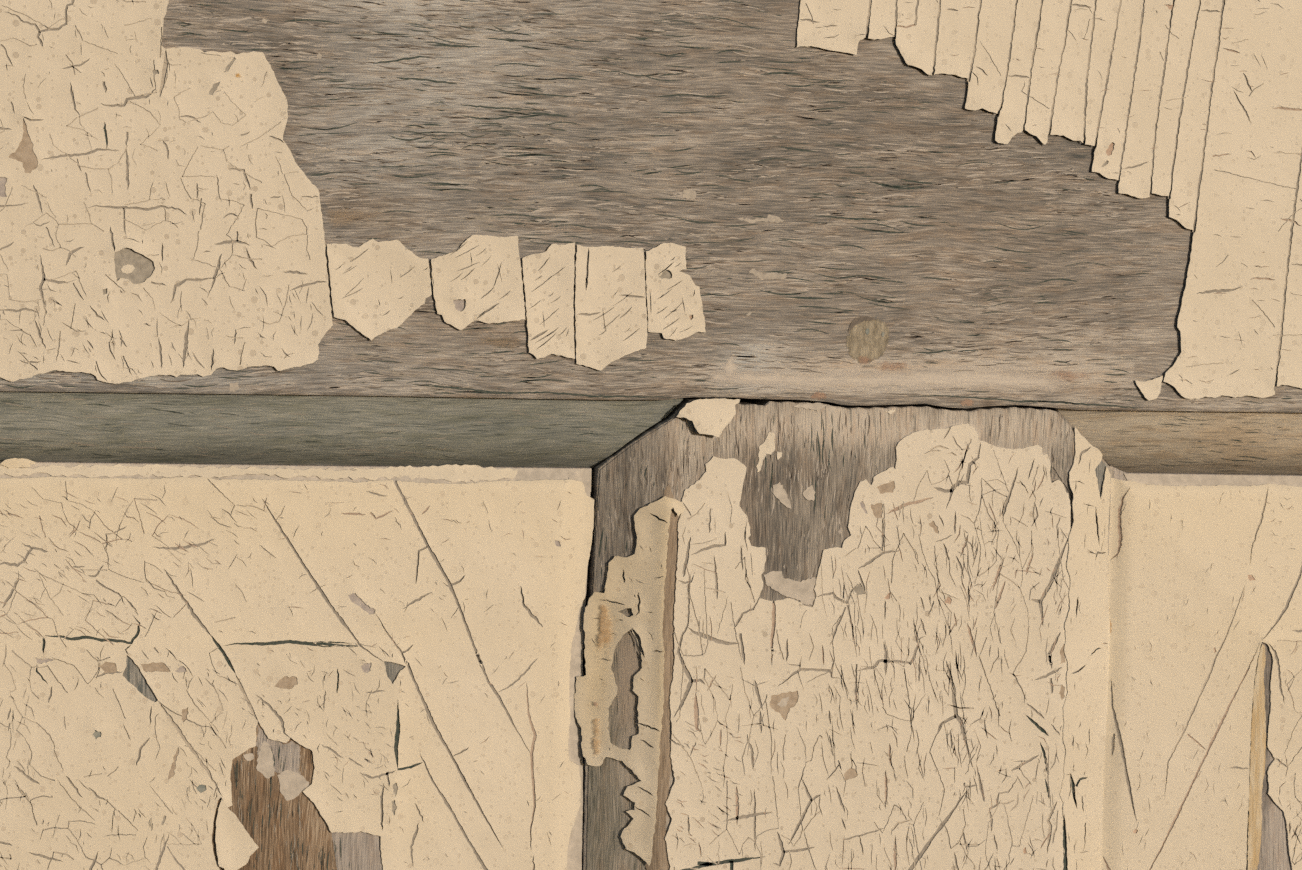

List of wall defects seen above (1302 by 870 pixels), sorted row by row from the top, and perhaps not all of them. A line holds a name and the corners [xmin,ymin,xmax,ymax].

crack [777,145,816,153]
peeling [0,0,1302,607]
peeling [212,722,383,870]
peeling [567,509,681,870]
peeling [769,691,798,720]
peeling [843,767,857,781]
peeling [1246,642,1292,870]